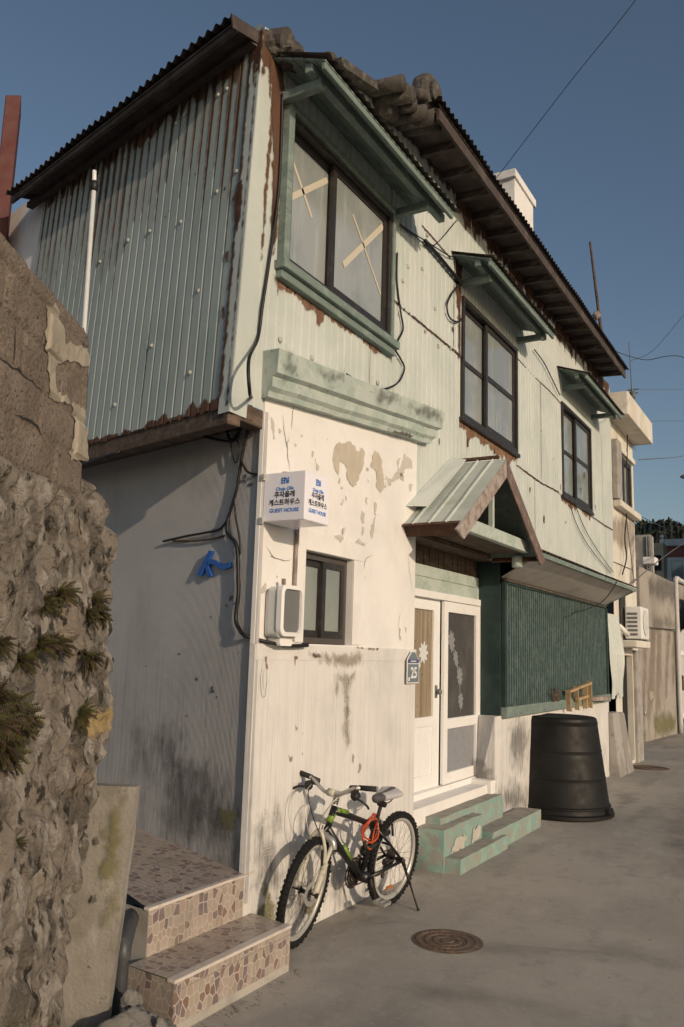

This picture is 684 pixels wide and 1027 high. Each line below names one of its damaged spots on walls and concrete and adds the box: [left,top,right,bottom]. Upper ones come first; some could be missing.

rust [36,28,285,445]
rust [275,278,381,354]
rust [408,137,609,394]
peeling [333,441,413,545]
rust [459,421,516,464]